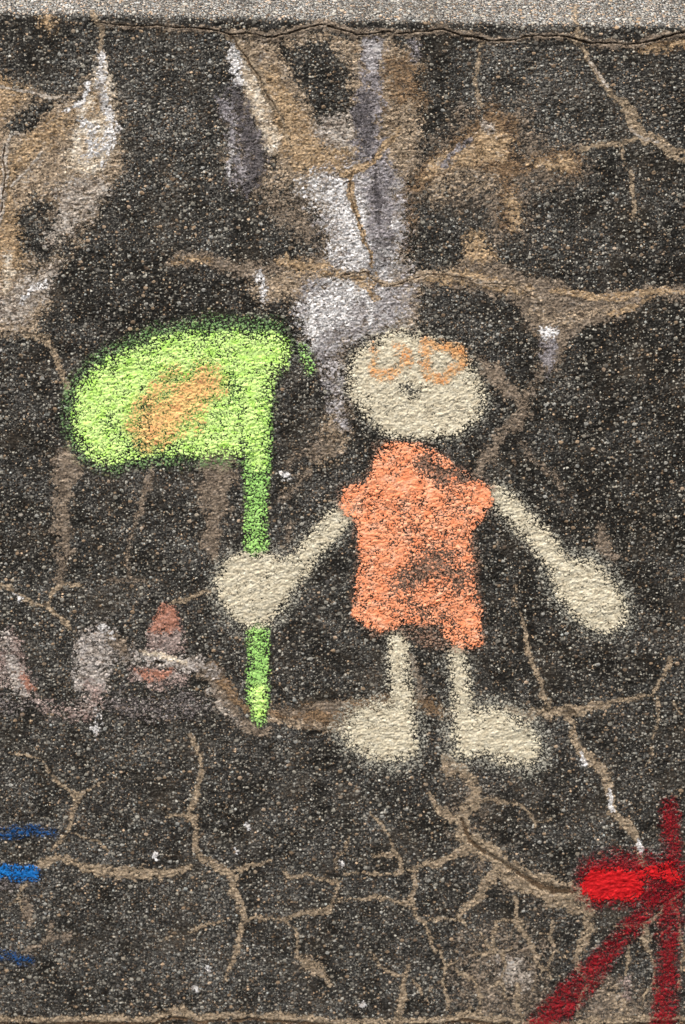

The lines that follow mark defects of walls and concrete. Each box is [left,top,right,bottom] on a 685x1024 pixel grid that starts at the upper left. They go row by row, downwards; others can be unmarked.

crack [0,131,43,224]
crack [0,85,78,99]
crack [90,4,685,221]
crack [338,127,685,317]
crack [0,581,83,631]
crack [168,587,216,605]
crack [504,585,680,867]
crack [0,733,685,1024]